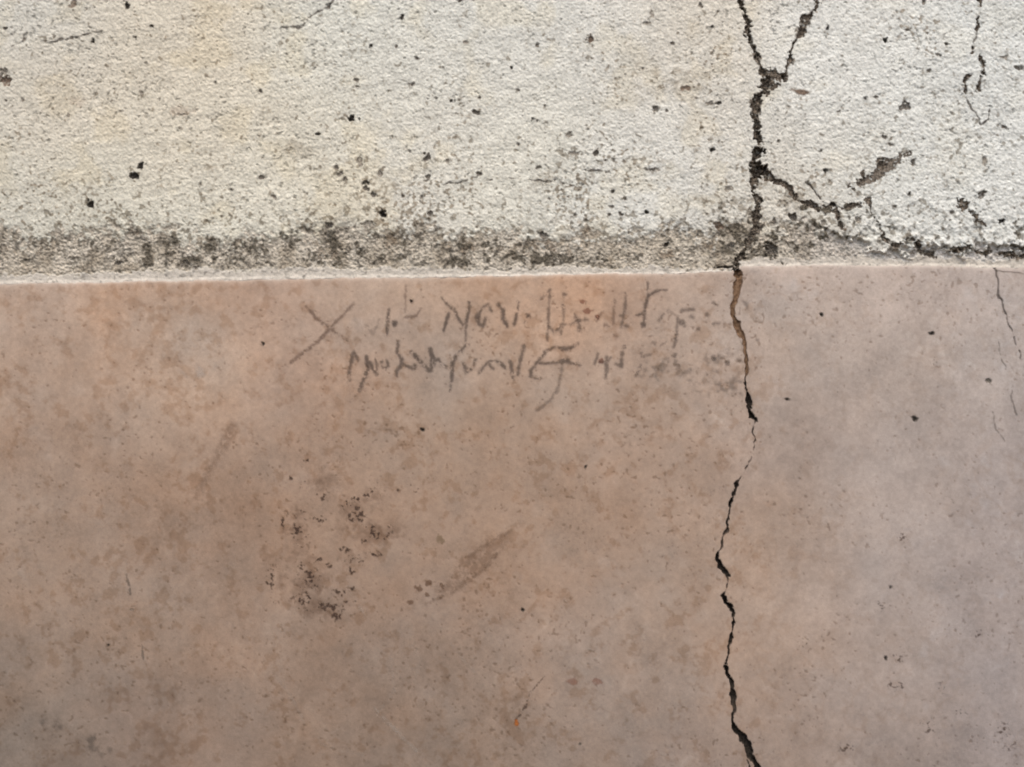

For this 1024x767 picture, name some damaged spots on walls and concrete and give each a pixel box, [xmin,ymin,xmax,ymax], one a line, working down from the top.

damp [142,232,269,267]
damp [281,225,643,267]
damp [716,227,736,255]
crack [714,0,1024,442]
crack [715,466,761,767]